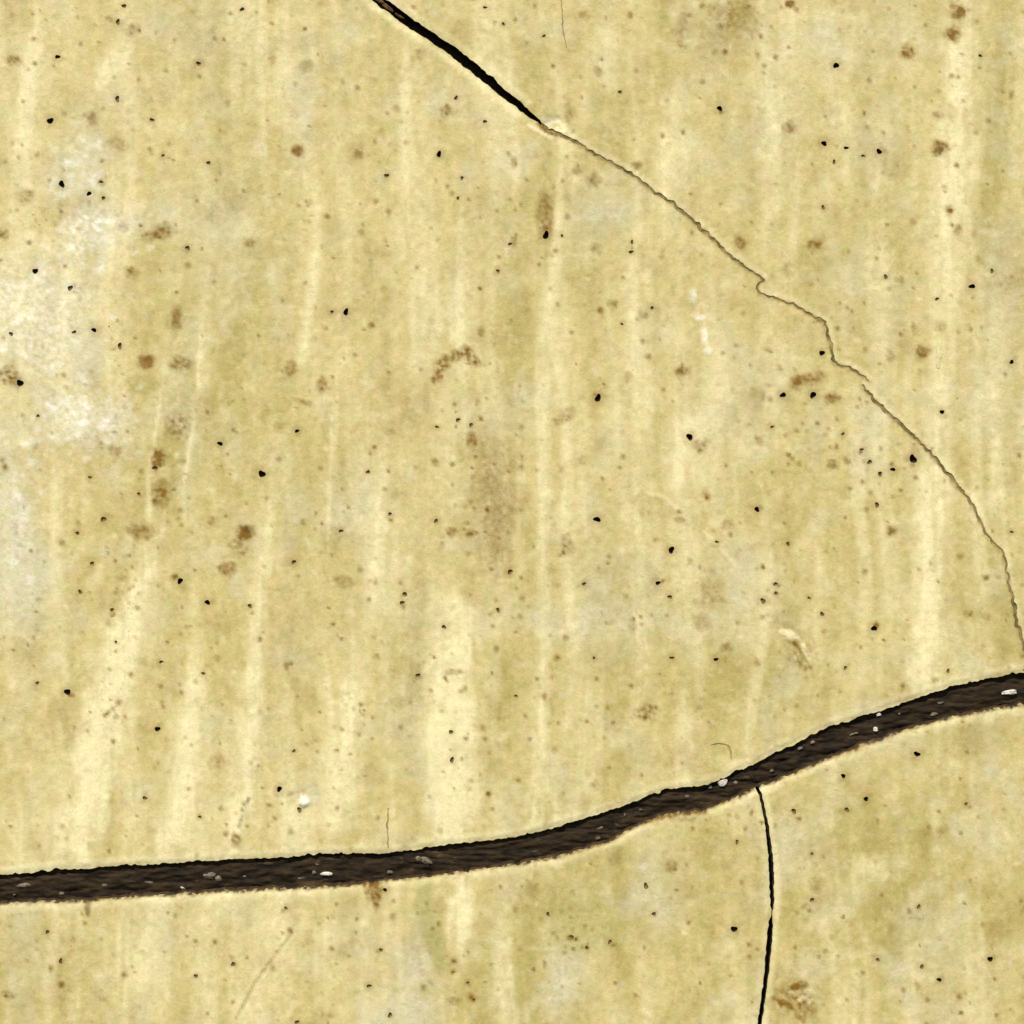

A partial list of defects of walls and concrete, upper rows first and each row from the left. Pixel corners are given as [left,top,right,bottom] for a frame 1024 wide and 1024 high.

crack [372,0,1024,651]
crack [0,672,1024,1024]